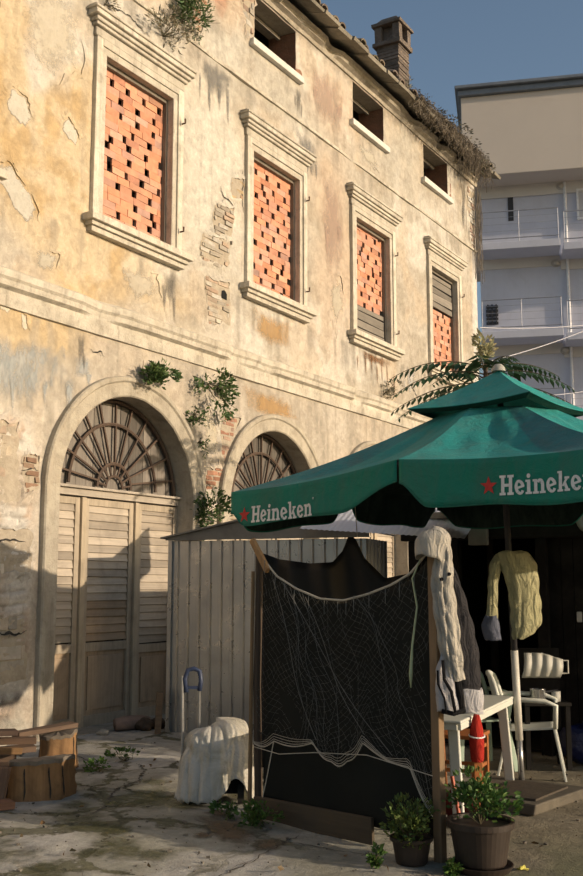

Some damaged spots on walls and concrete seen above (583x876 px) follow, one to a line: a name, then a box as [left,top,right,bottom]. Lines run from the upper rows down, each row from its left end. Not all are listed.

flaking render [189,0,209,41]
flaking render [238,0,257,43]
flaking render [0,80,36,125]
flaking render [61,110,83,144]
water stain [200,65,229,121]
flaking render [0,153,44,224]
flaking render [198,170,245,334]
flaking render [0,410,43,584]
crack [0,629,25,637]
crack [78,756,147,813]